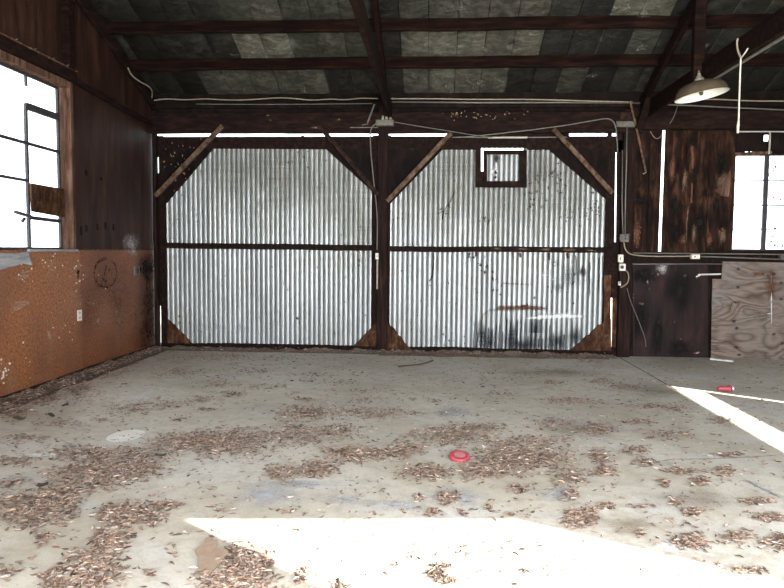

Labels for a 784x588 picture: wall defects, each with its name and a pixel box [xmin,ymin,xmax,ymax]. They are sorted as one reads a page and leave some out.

water stain [473,314,583,350]